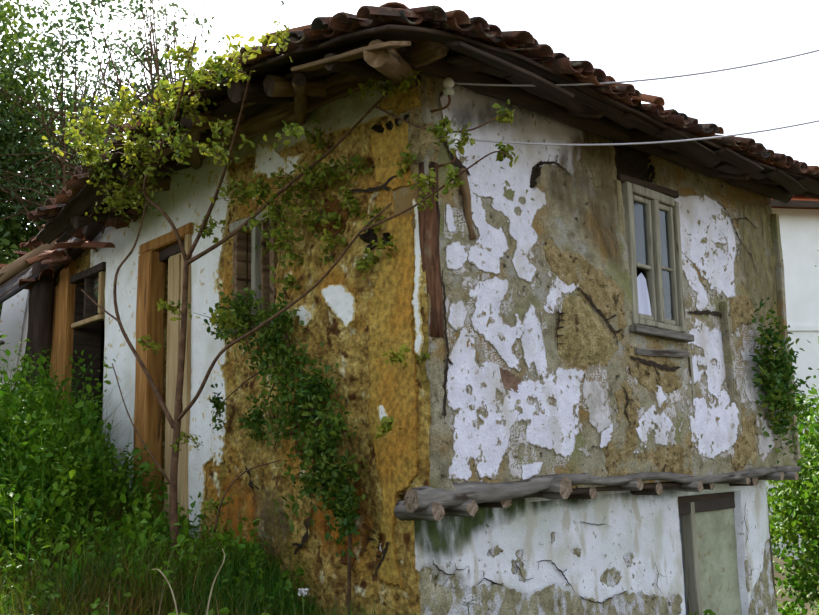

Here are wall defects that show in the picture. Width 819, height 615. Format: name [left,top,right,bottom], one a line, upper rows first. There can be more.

flaking render [90,81,421,539]
flaking render [438,84,785,482]
crack [576,286,681,375]
flaking render [359,198,424,589]
spalling [487,545,503,558]
crack [433,560,627,610]
spalling [418,549,682,615]